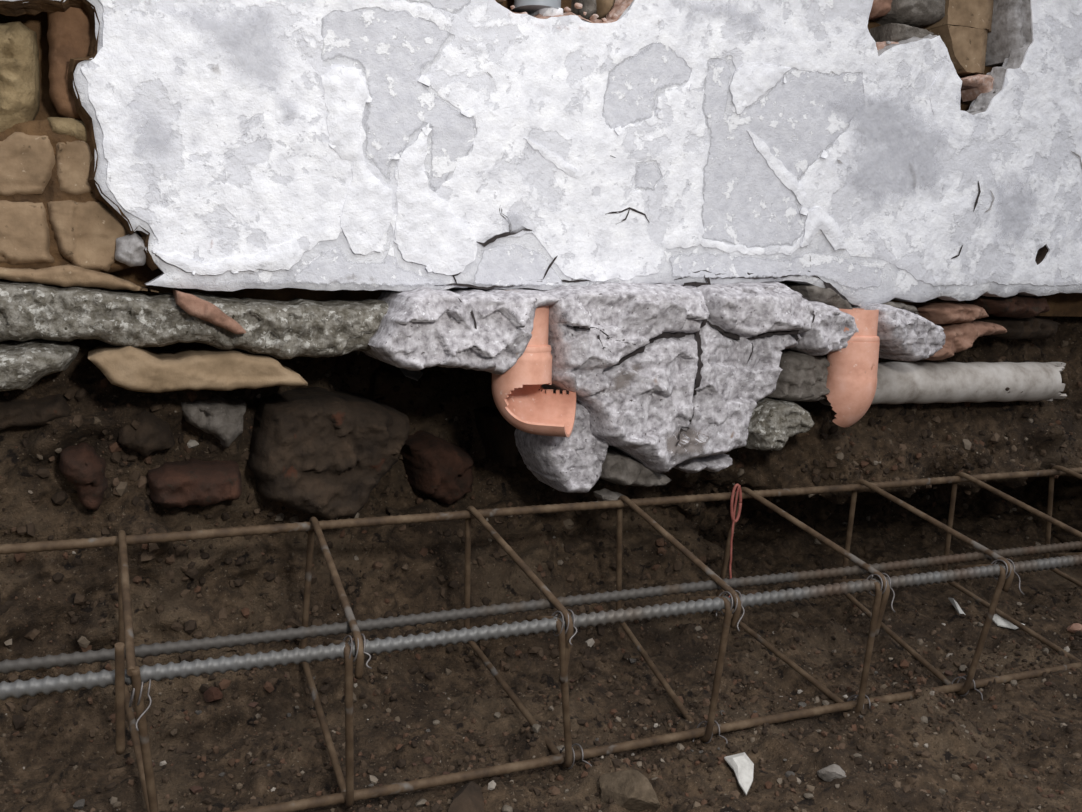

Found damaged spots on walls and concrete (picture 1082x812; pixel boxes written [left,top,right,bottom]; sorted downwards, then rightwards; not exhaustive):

spalling [508,0,633,23]
spalling [961,0,1032,115]
peeling [0,0,562,287]
crack [476,209,532,247]
crack [605,207,649,224]